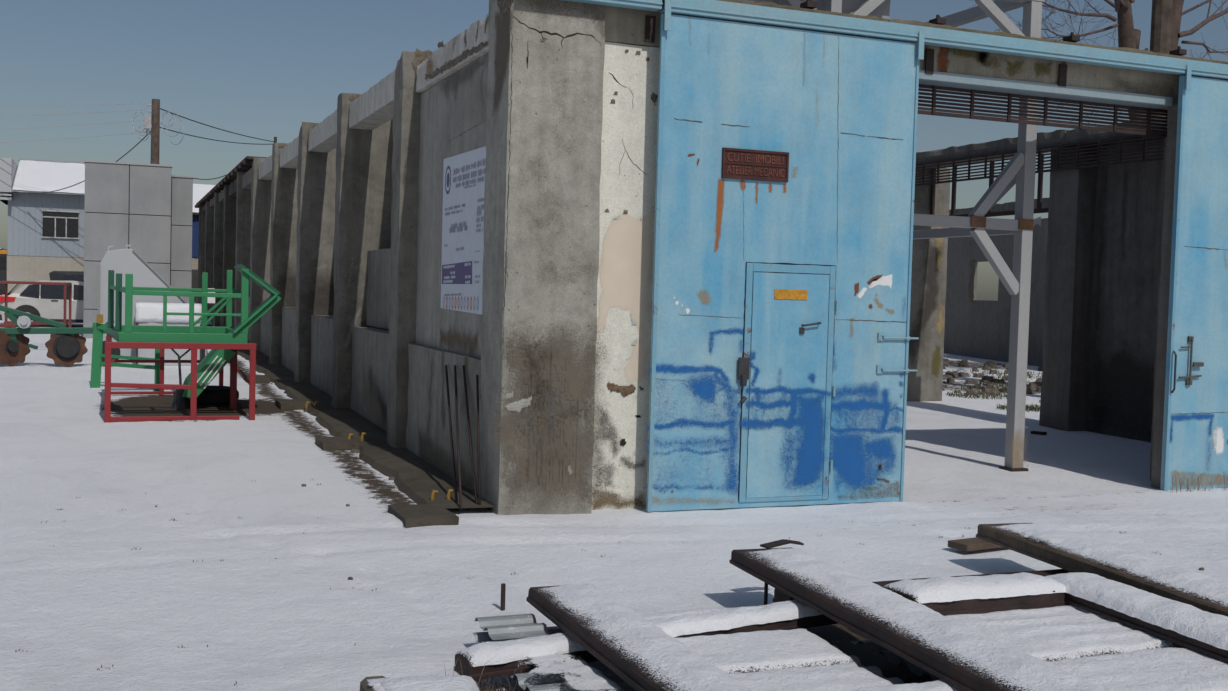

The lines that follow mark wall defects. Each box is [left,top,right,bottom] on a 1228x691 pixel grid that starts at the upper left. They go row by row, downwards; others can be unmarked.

crack [446,16,634,398]
corrosion [714,178,725,252]
corrosion [740,167,798,203]
peeling [597,207,654,398]
peeling [854,274,894,314]
water stain [908,240,943,368]
water stain [268,240,646,515]